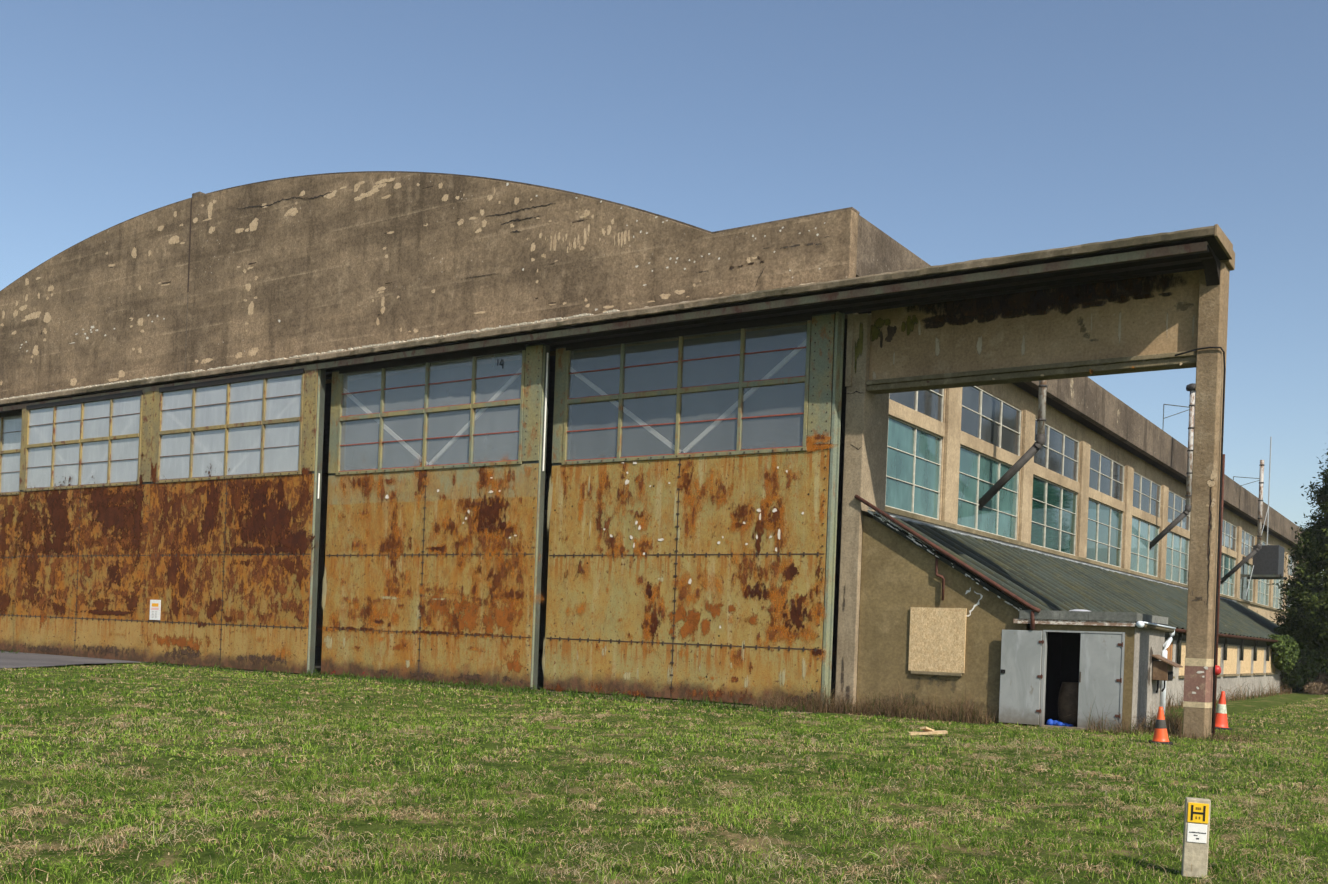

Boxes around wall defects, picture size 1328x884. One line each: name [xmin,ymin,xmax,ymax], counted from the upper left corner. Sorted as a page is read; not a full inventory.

spalling [157,199,216,244]
spalling [235,203,267,233]
spalling [323,178,401,201]
spalling [457,187,532,233]
peeling [522,209,630,320]
spalling [0,277,54,364]
rust [795,434,833,452]
rust [563,462,654,565]
rust [0,454,315,666]
rust [323,458,540,684]
rust [628,459,826,658]
rust [588,649,767,704]